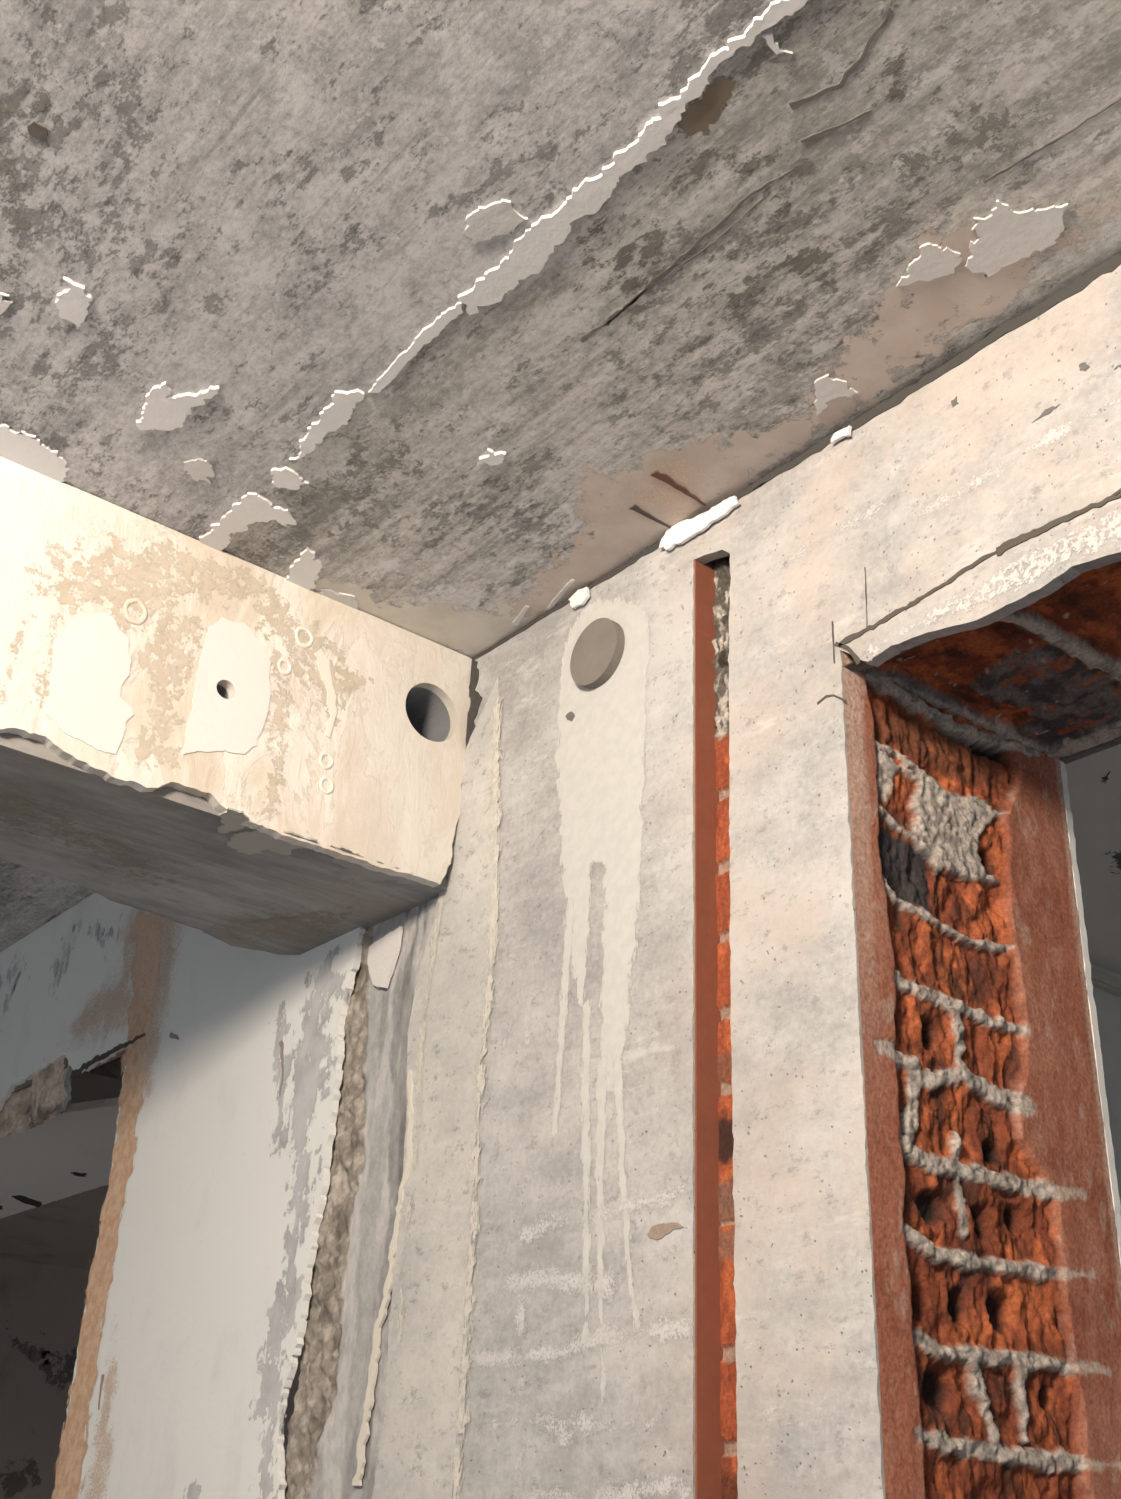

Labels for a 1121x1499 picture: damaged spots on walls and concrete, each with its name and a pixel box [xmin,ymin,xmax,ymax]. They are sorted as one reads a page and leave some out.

crack [580,8,891,343]
crack [983,98,1121,183]
peeling [199,0,808,551]
peeling [0,424,70,482]
leakage [547,579,575,610]
flaking render [865,505,1121,661]
peeling [1105,851,1121,874]
spalling [0,1058,73,1139]
spalling [217,807,440,1499]
leakage [448,694,532,1499]
leakage [489,595,692,1499]
peeling [183,1481,202,1499]